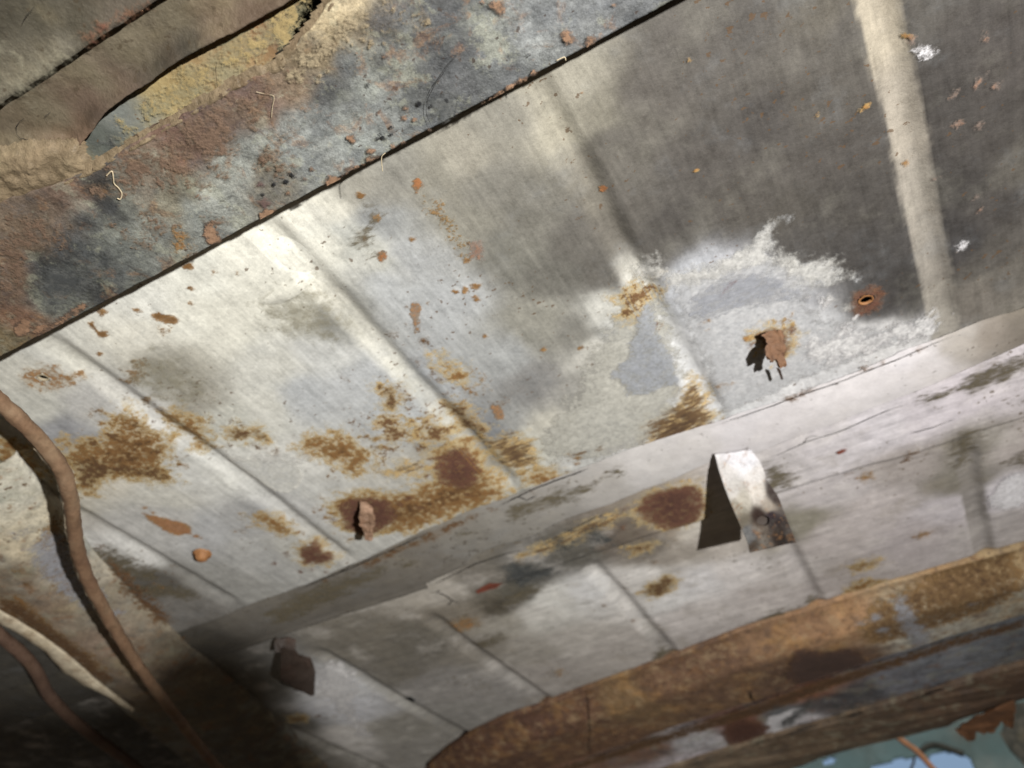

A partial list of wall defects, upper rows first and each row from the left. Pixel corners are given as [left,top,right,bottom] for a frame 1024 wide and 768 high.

rust [22,365,84,392]
rust [54,397,278,498]
rust [292,303,603,568]
rust [610,276,663,327]
rust [645,375,720,444]
damp [541,225,941,463]
rust [743,313,799,358]
rust [235,510,338,582]
rust [515,479,712,563]
rust [635,574,679,601]
rust [567,620,1023,768]
damp [785,648,871,684]